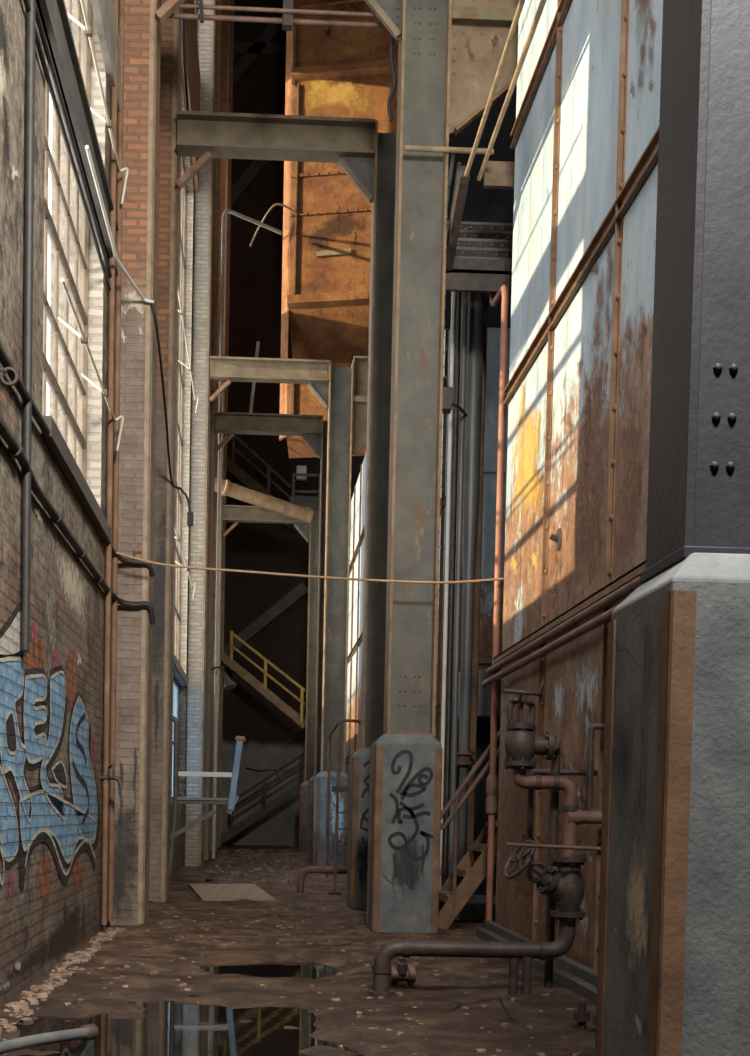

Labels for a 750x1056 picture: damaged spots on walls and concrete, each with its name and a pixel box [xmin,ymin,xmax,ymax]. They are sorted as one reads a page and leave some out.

corrosion [630,0,654,96]
corrosion [591,247,612,347]
corrosion [512,385,540,512]
corrosion [531,358,608,598]